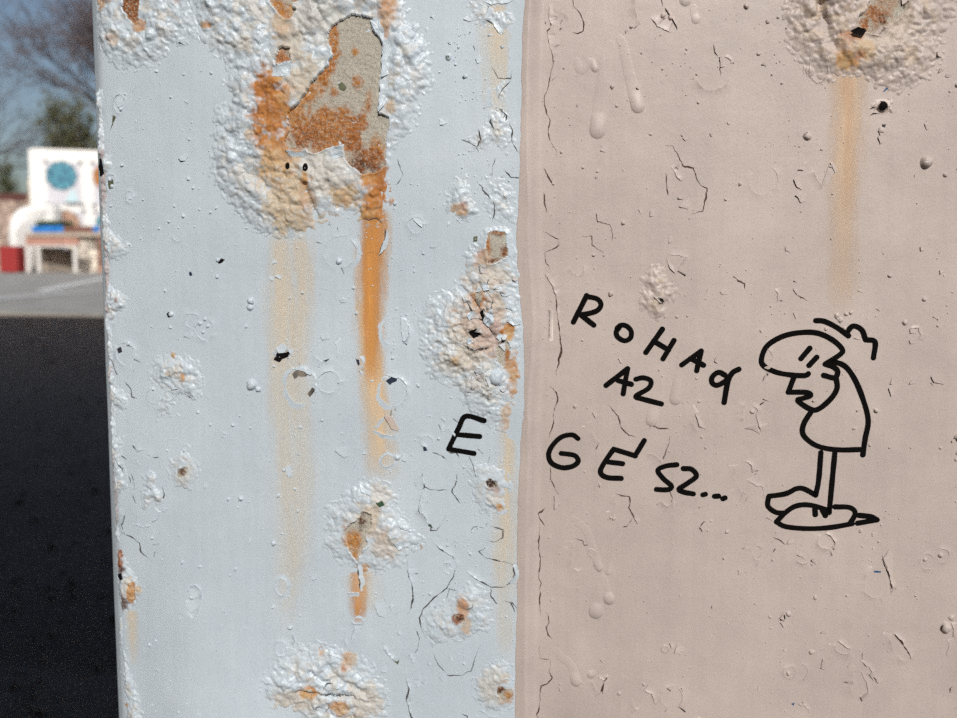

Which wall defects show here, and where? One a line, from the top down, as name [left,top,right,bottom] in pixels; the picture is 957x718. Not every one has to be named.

rust [360,218,386,461]
crack [401,449,559,718]